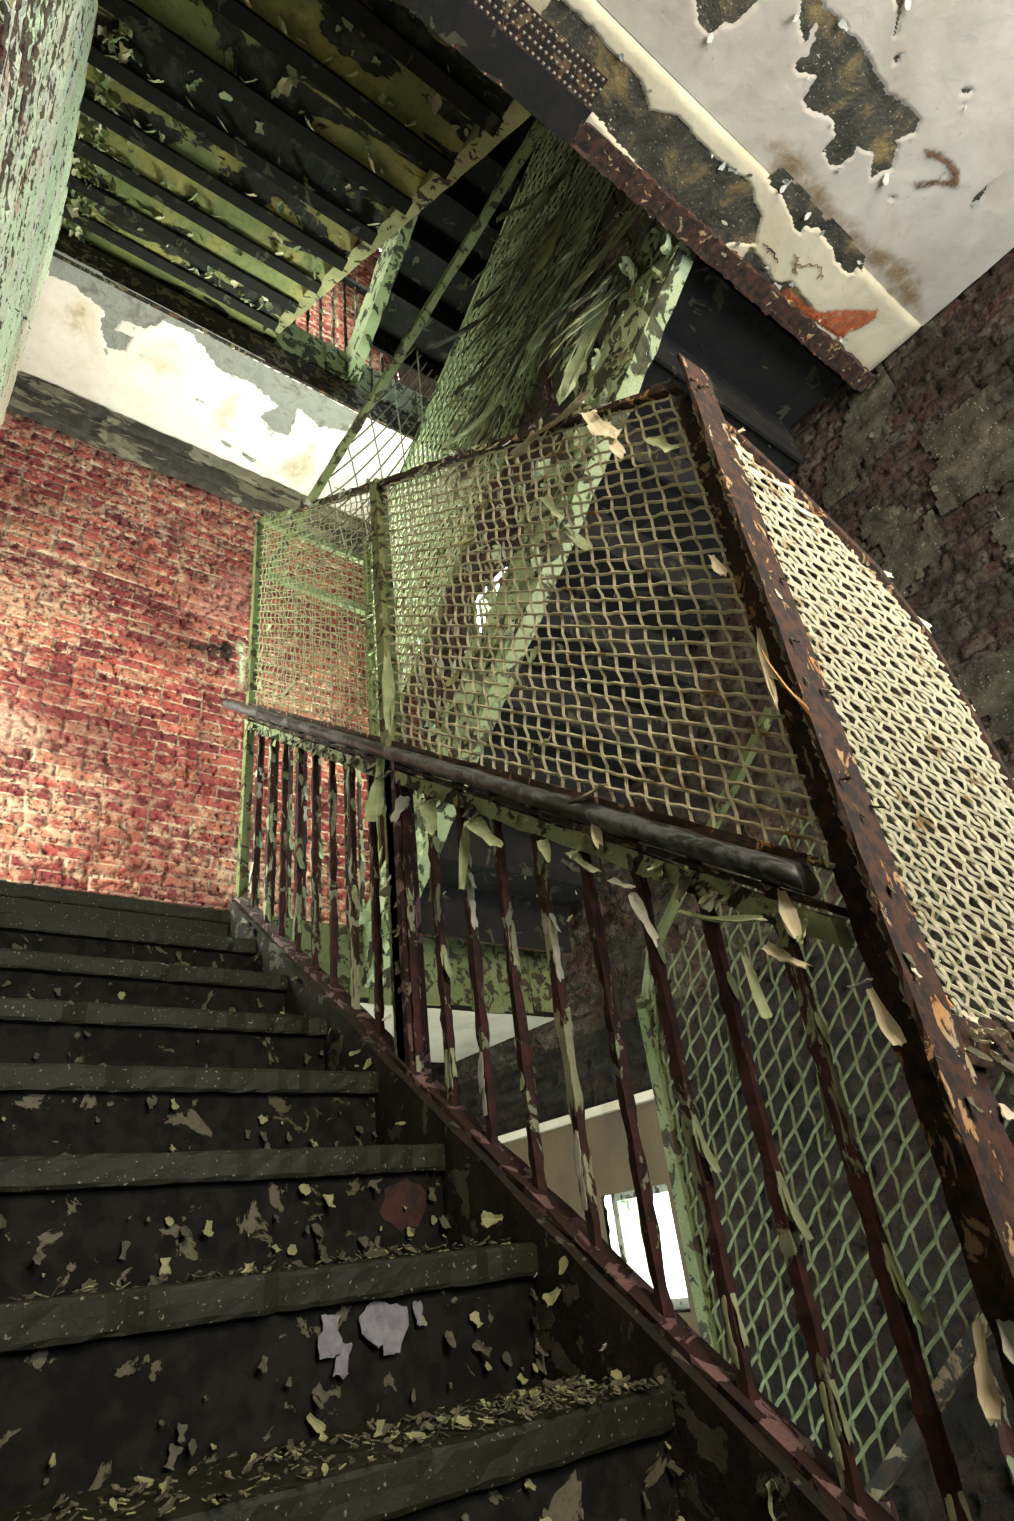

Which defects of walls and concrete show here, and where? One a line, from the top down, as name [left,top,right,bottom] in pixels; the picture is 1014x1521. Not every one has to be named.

spalling [793,0,920,205]
spalling [48,15,358,437]
spalling [541,0,866,348]
corrosion [783,289,877,340]
peeling [424,212,679,761]
peeling [359,846,401,994]
corrosion [903,952,922,978]
peeling [958,1009,1014,1074]
peeling [147,1257,171,1285]
peeling [470,1210,504,1248]
peeling [445,1256,568,1385]
peeling [159,1419,217,1471]